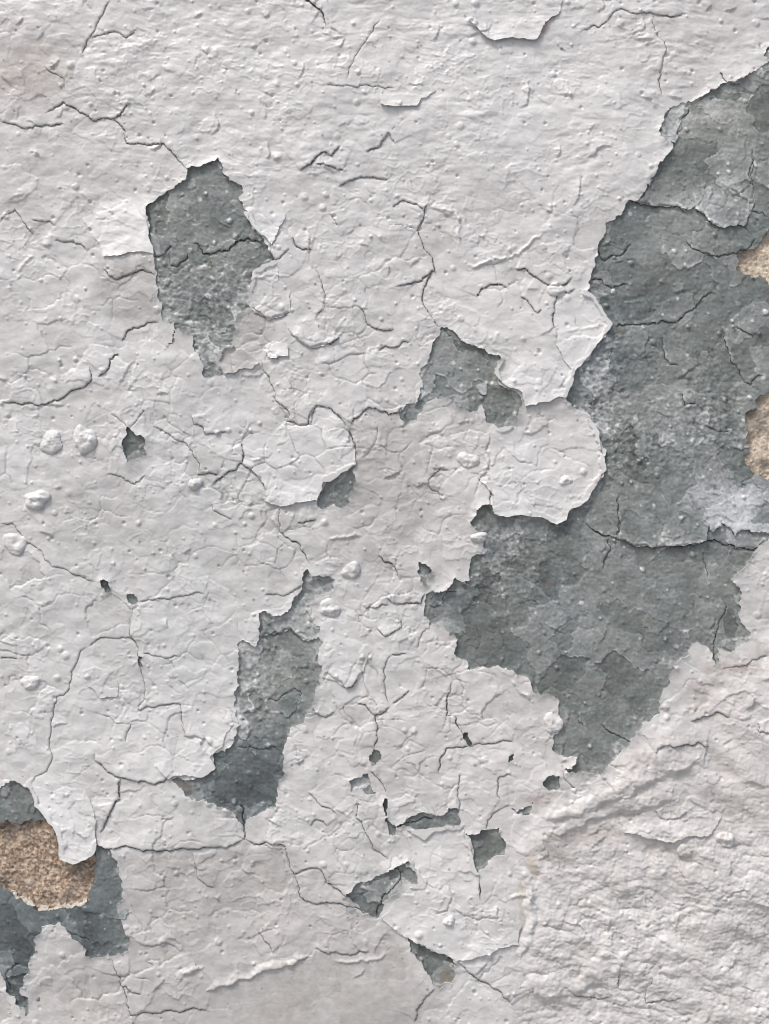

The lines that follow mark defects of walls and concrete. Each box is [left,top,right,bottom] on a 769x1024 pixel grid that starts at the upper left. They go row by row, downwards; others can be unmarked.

crack [1,67,187,169]
crack [0,321,156,406]
peeling [83,158,338,378]
peeling [242,407,356,509]
crack [391,200,441,327]
peeling [399,47,769,791]
crack [31,592,203,784]
peeling [155,569,369,836]
crack [344,555,430,746]
peeling [0,776,141,1016]
crack [100,763,365,914]
peeling [346,749,522,988]